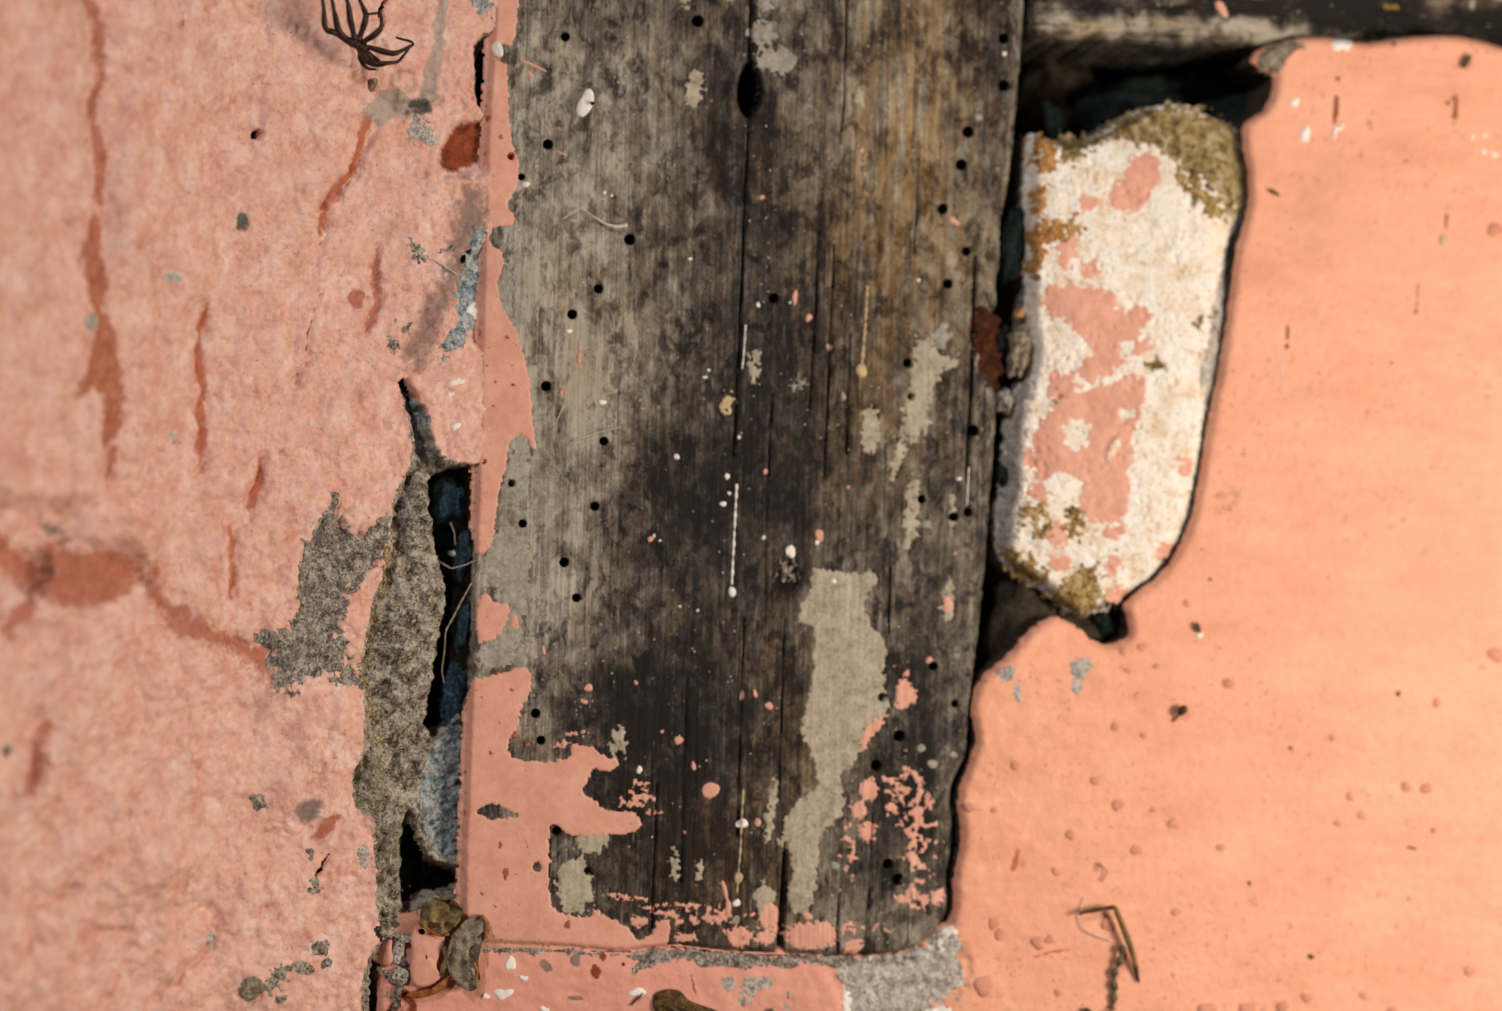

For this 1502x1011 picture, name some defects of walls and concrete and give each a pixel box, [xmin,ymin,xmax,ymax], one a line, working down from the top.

spalling [254,0,967,1011]
flaking render [984,99,1245,642]
flaking render [247,793,269,811]